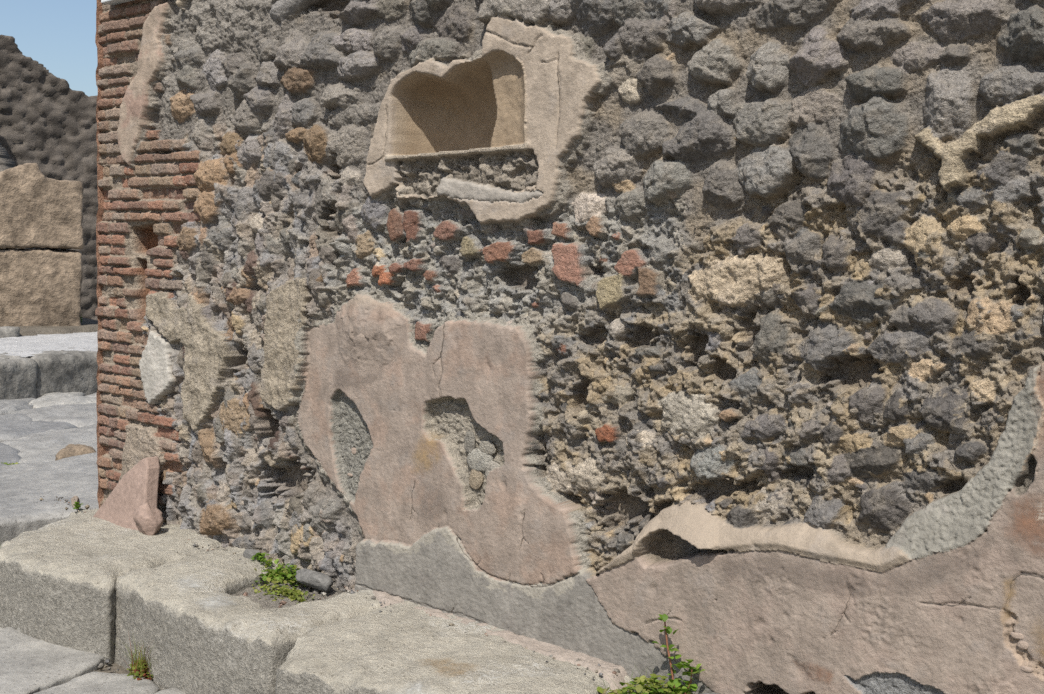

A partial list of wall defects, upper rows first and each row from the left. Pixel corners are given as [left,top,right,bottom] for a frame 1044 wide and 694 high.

spalling [331,389,373,501]
spalling [424,396,505,511]
crack [920,573,1044,610]
peeling [1000,607,1044,682]
spalling [846,671,946,694]